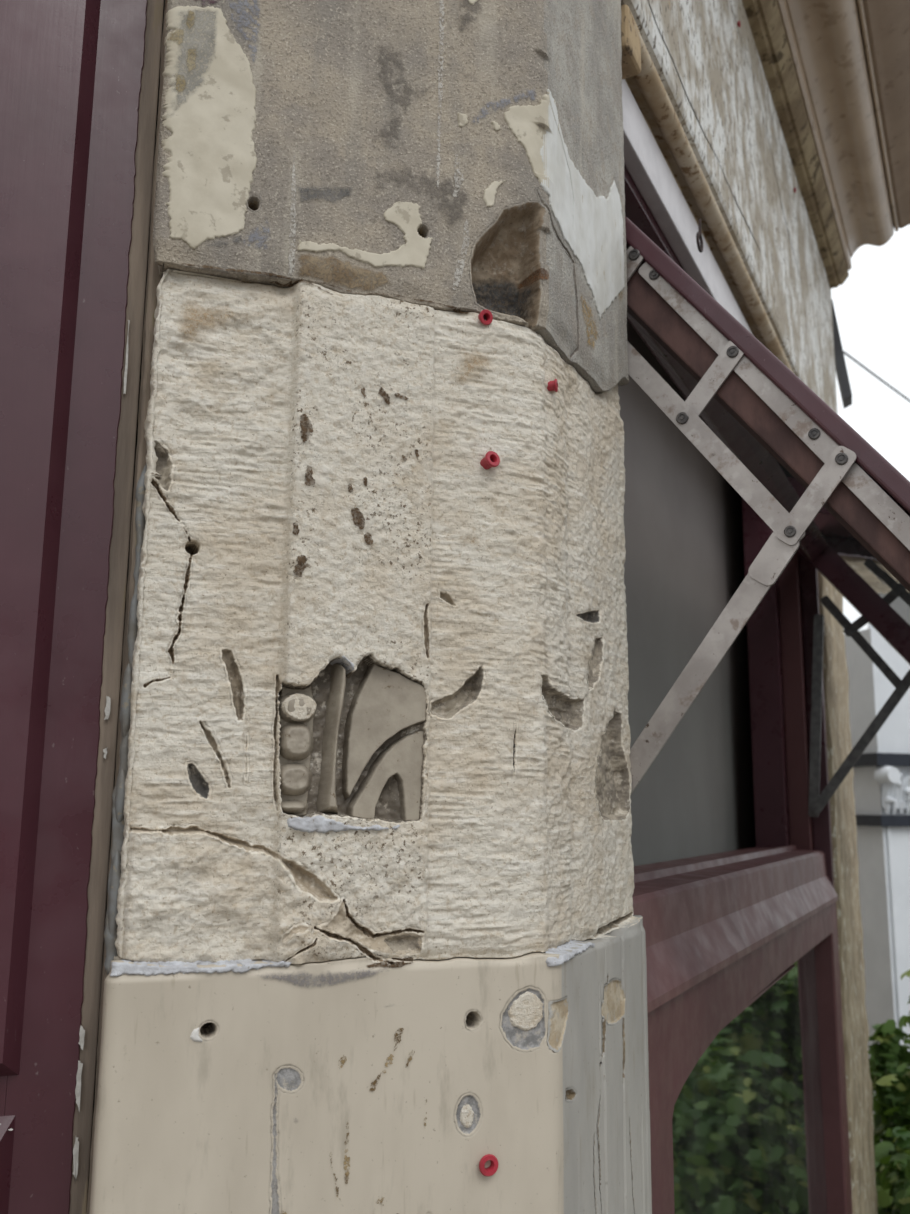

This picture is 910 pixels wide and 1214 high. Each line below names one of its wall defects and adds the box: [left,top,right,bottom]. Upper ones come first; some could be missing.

leakage [460,0,481,30]
peeling [297,201,433,269]
spalling [469,180,548,331]
crack [141,471,195,690]
spalling [540,609,605,732]
spalling [595,706,631,823]